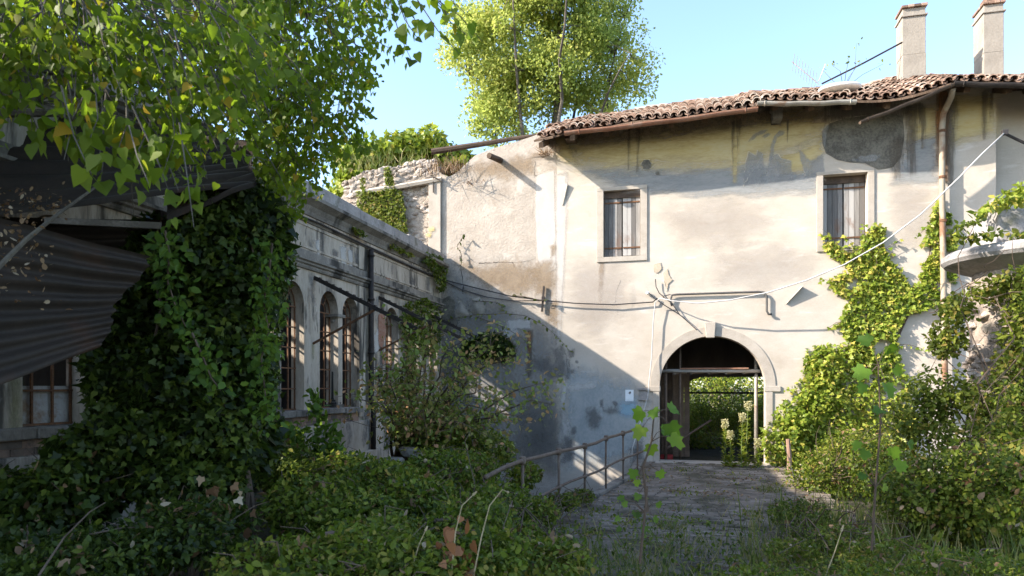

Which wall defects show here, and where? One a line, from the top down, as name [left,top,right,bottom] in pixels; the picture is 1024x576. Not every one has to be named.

peeling [556,108,936,175]
water stain [578,102,938,197]
water stain [444,284,644,462]